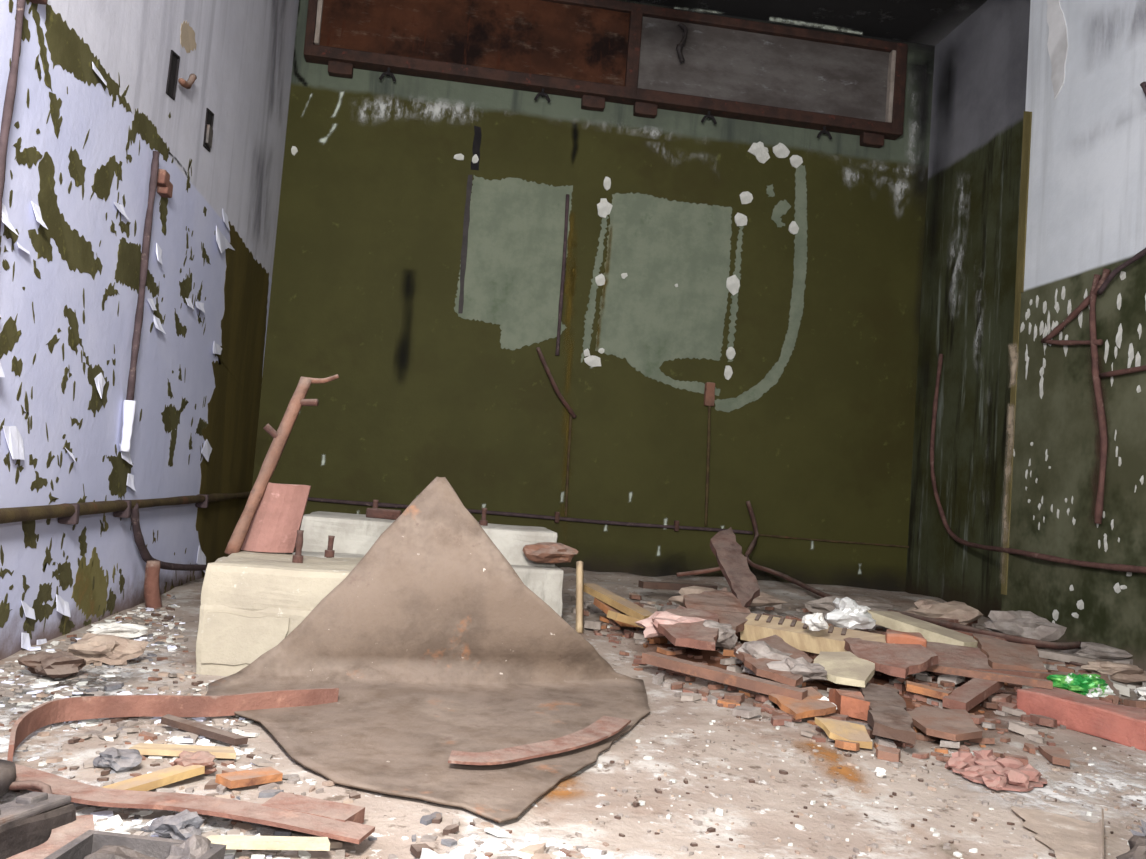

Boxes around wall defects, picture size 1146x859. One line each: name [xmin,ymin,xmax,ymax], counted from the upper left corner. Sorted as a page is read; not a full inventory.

leakage [425,103,463,117]
peeling [748,142,803,168]
peeling [597,177,612,218]
peeling [734,191,753,226]
peeling [0,0,269,737]
peeling [584,348,604,367]
peeling [724,347,736,380]
peeling [1009,286,1090,399]
peeling [1104,271,1142,387]
peeling [1052,585,1084,623]
peeling [198,814,257,836]
peeling [410,812,512,858]